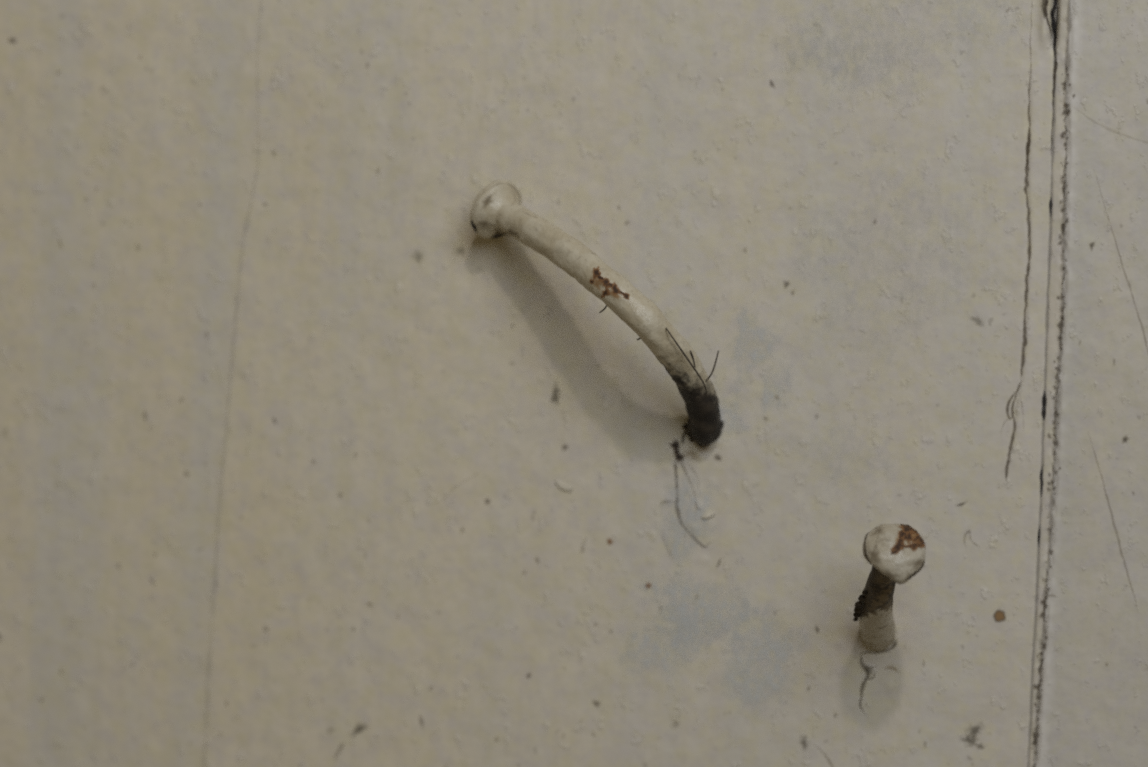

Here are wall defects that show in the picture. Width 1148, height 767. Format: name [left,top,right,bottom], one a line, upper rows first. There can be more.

crack [1003,0,1057,480]
corrosion [589,267,630,300]
crack [1037,467,1045,496]
corrosion [891,524,926,554]